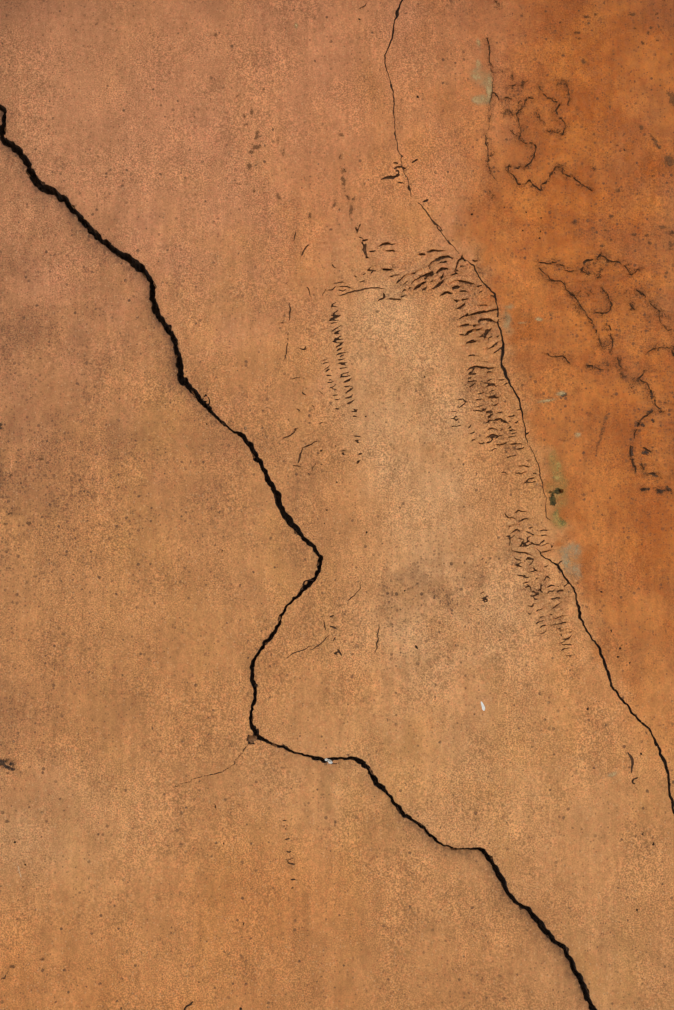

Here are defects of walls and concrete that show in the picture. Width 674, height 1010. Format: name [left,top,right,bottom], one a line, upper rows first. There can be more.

crack [384,0,550,520]
crack [0,104,597,1010]
crack [536,548,674,814]